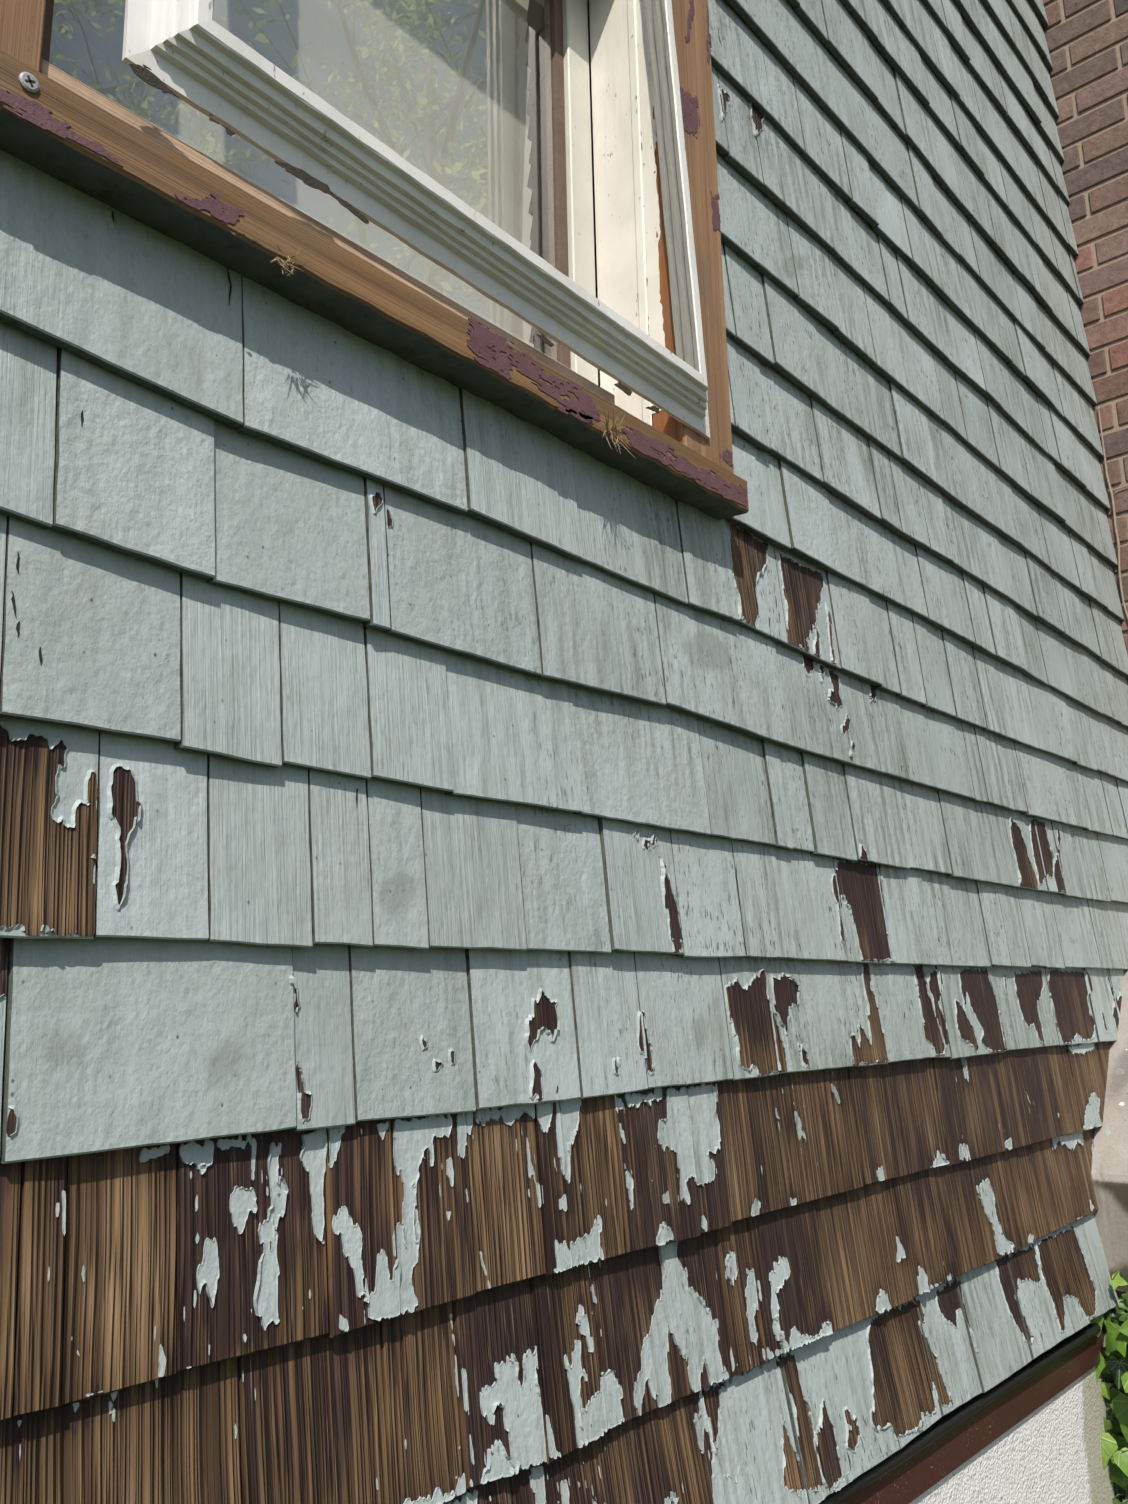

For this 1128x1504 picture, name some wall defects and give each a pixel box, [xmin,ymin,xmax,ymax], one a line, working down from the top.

peeling [685,0,712,64]
peeling [0,89,123,167]
peeling [680,86,700,138]
peeling [174,193,261,246]
peeling [635,0,665,347]
peeling [710,191,721,231]
peeling [467,318,601,424]
peeling [621,425,748,507]
peeling [727,522,855,759]
peeling [0,719,142,1001]
peeling [1009,816,1065,893]
peeling [0,829,1122,1504]